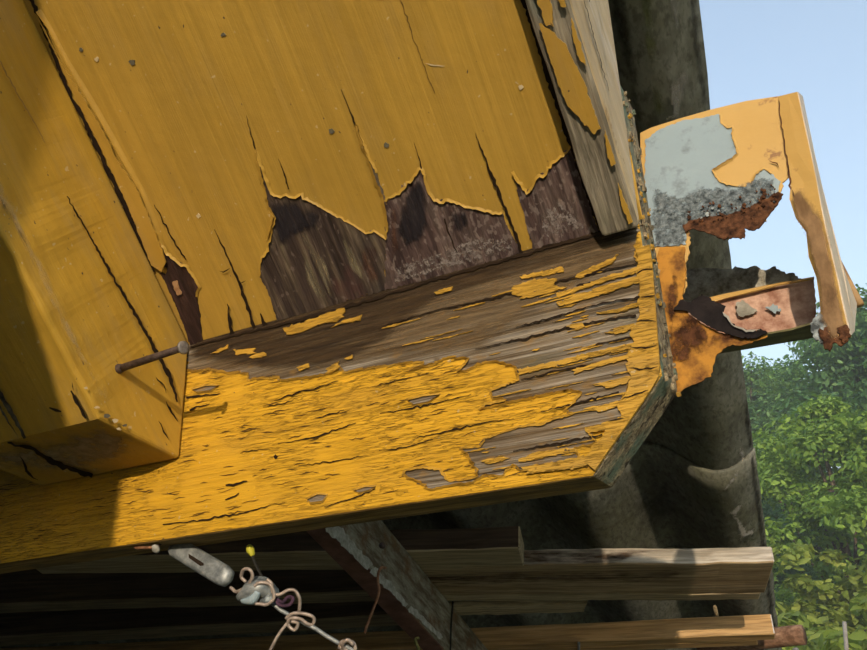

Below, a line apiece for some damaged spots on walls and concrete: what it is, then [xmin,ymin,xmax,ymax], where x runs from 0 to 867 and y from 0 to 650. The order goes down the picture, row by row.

crack [29,0,155,272]
peeling [537,0,616,166]
peeling [186,91,781,491]
rust [651,178,851,361]
crack [0,391,93,480]
crack [49,384,86,419]
peeling [306,492,328,504]
peeling [353,485,376,494]